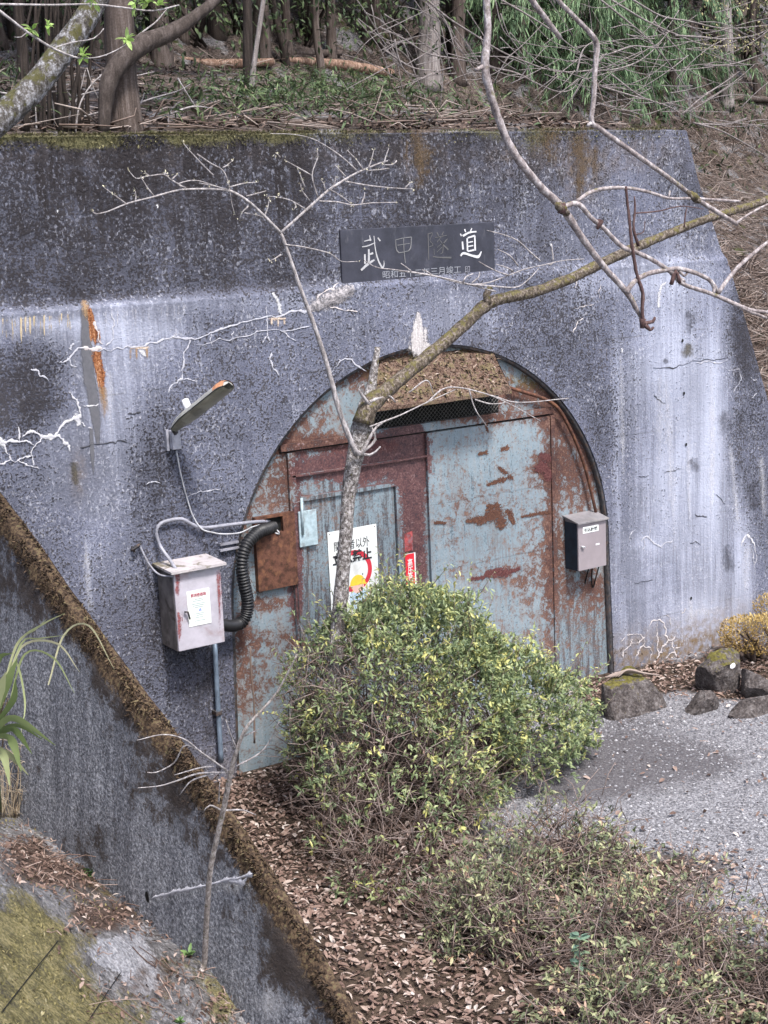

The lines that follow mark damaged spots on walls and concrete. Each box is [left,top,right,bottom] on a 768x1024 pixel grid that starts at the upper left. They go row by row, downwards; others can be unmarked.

crack [31,283,358,392]
rust [81,301,107,470]
crack [0,394,126,469]
rust [487,466,513,486]
rust [533,452,552,483]
rust [466,500,551,530]
rust [471,565,521,581]
crack [621,610,685,659]